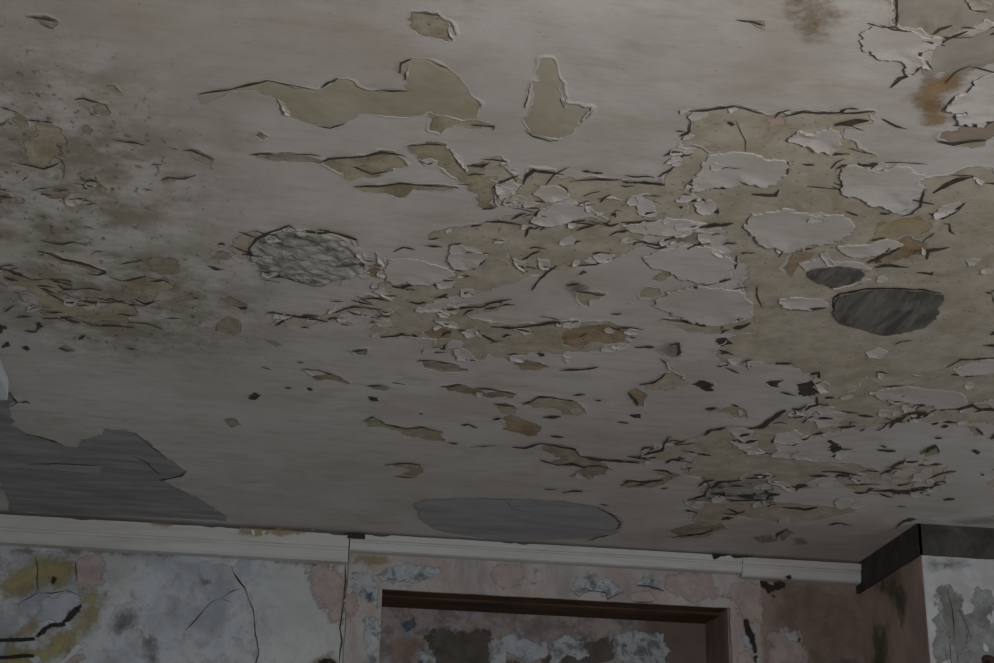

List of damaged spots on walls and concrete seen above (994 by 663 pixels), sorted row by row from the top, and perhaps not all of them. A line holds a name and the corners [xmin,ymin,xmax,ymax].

peeling [405,9,461,44]
peeling [859,0,994,150]
peeling [152,148,216,184]
peeling [196,54,994,544]
flaking render [0,391,230,521]
peeling [19,557,82,637]
crack [186,566,259,663]
peeling [343,557,442,663]
peeling [420,626,671,663]
peeling [570,572,792,663]
flaking render [932,584,994,663]